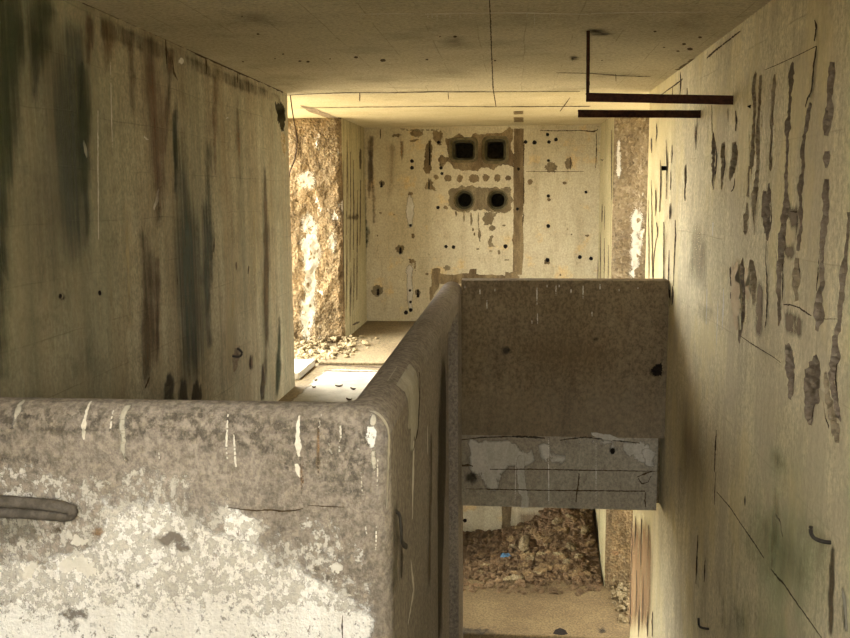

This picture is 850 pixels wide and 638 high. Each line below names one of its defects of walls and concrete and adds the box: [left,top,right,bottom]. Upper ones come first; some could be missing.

leakage [0,0,52,313]
leakage [58,31,99,247]
leakage [142,232,159,378]
leakage [164,110,212,400]
leakage [260,320,281,400]
spalling [275,101,360,344]
peeling [392,111,533,301]
spalling [743,62,812,335]
spalling [785,212,850,443]
peeling [0,464,374,638]
crack [228,504,337,512]
crack [714,430,822,638]